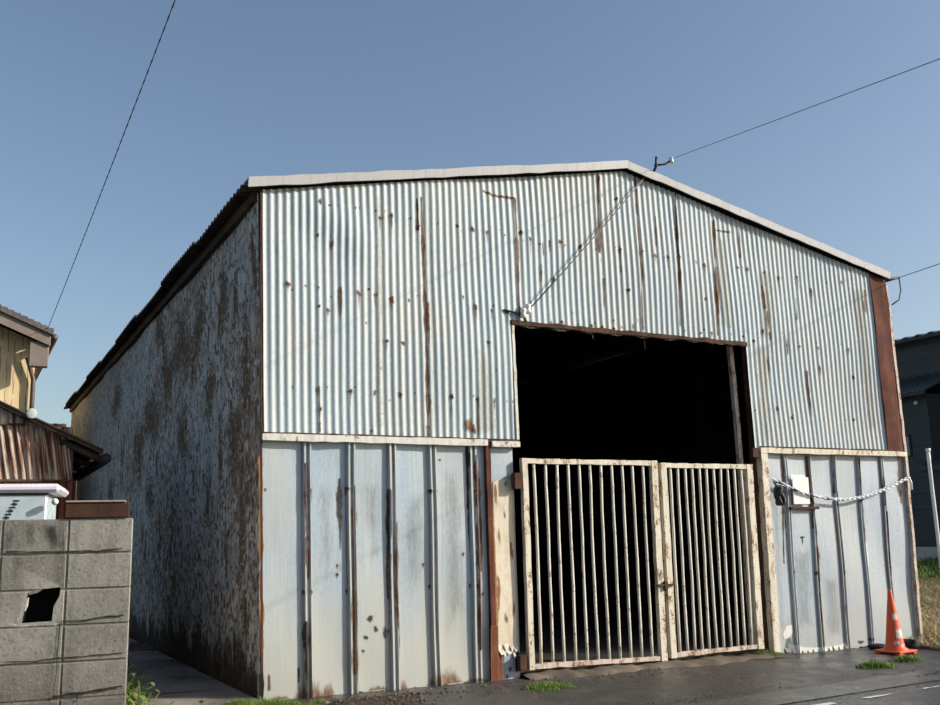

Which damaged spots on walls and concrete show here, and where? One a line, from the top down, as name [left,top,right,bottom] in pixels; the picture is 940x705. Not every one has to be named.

rust [389,197,431,437]
rust [483,190,563,319]
rust [572,174,682,334]
rust [696,220,749,335]
peeling [100,224,259,656]
spalling [11,589,61,627]
rust [336,478,359,680]
rust [385,489,400,634]
rust [462,446,515,682]